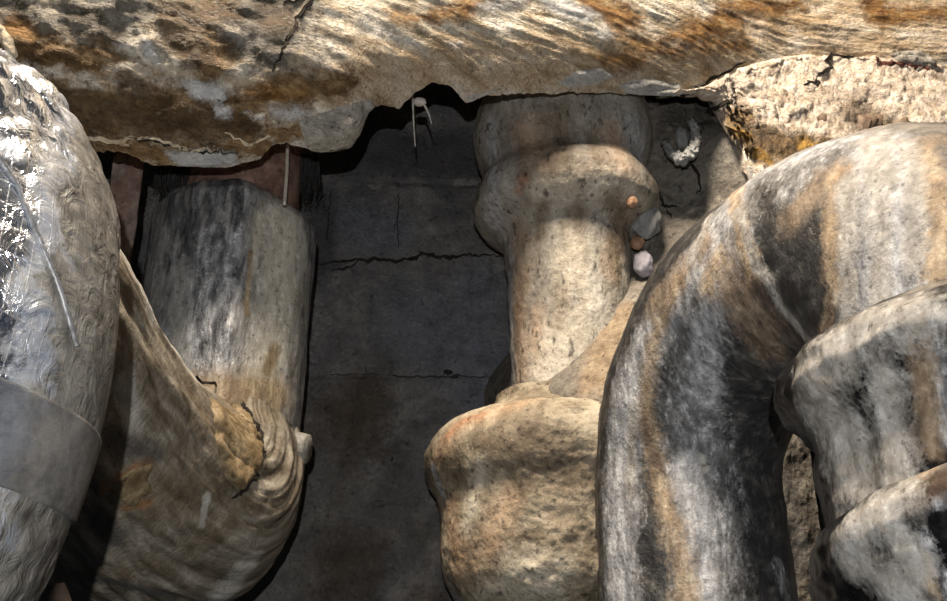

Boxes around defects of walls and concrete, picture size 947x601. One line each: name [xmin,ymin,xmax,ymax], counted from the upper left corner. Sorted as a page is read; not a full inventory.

corrosion [4,15,40,43]
crack [272,0,313,71]
corrosion [383,0,530,24]
corrosion [860,0,947,29]
crack [803,52,856,86]
crack [316,190,500,272]